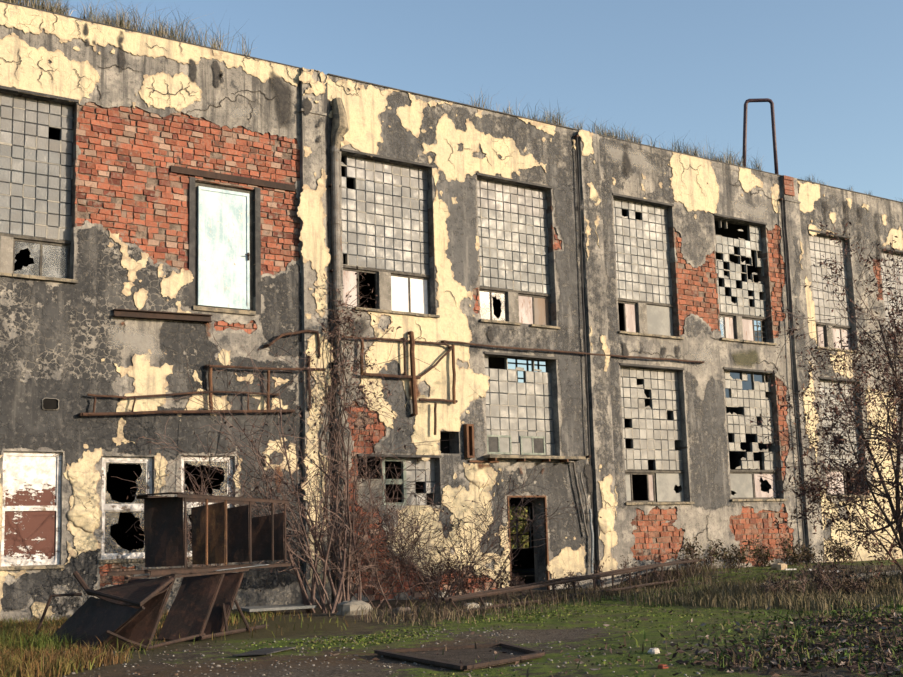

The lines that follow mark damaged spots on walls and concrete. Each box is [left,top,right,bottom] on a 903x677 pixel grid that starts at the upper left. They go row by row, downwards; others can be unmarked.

flaking render [0,2,721,620]
peeling [685,371,794,567]
flaking render [738,167,903,562]